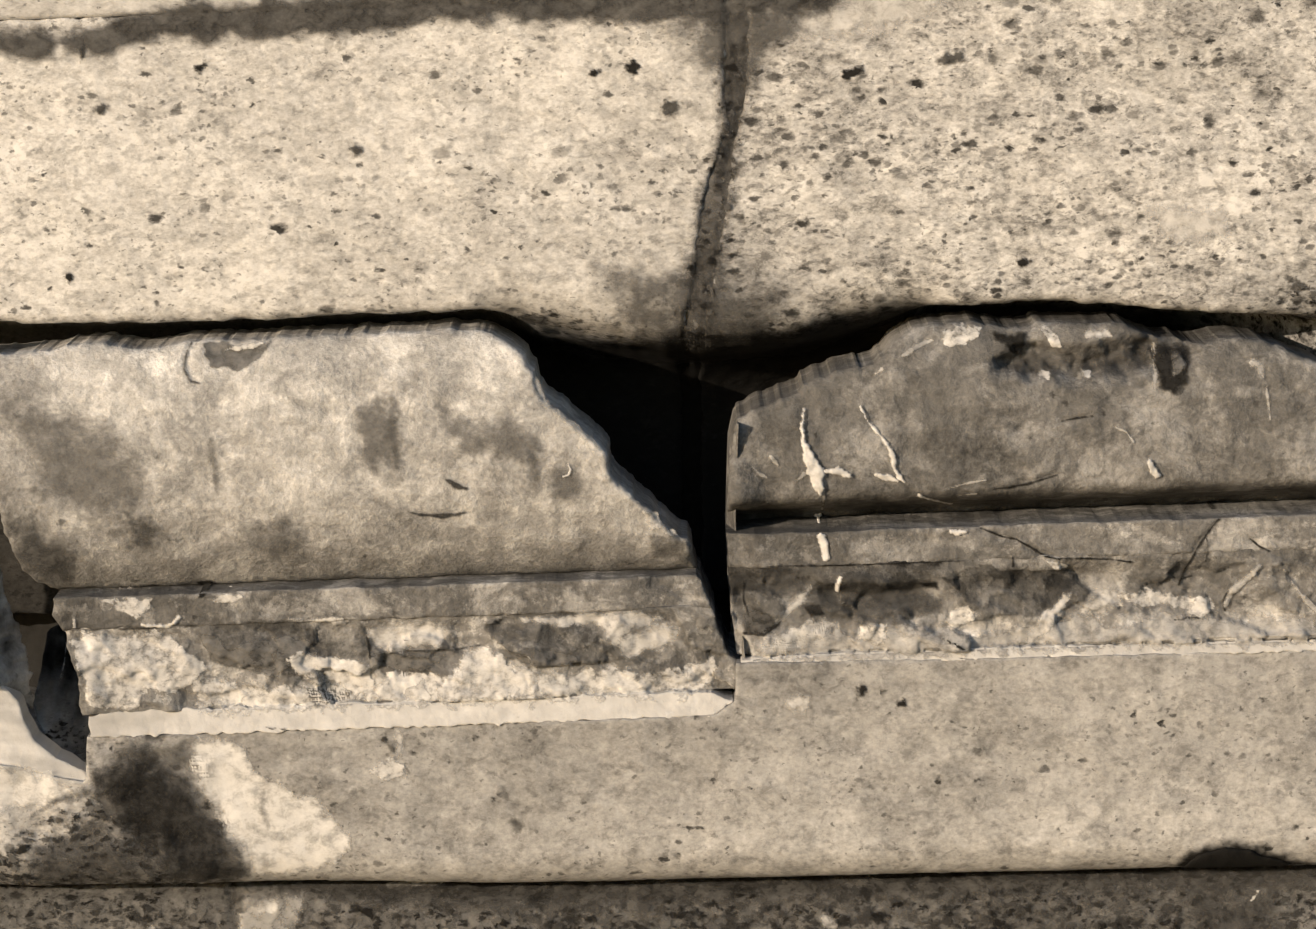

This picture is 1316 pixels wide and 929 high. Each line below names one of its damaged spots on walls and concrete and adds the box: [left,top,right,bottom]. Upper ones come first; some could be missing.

leakage [0,0,838,350]
spalling [564,418,604,456]
crack [994,475,1056,490]
spalling [643,511,677,536]
crack [980,528,1131,567]
crack [1178,500,1222,585]
crack [743,561,959,636]
crack [1174,590,1229,620]